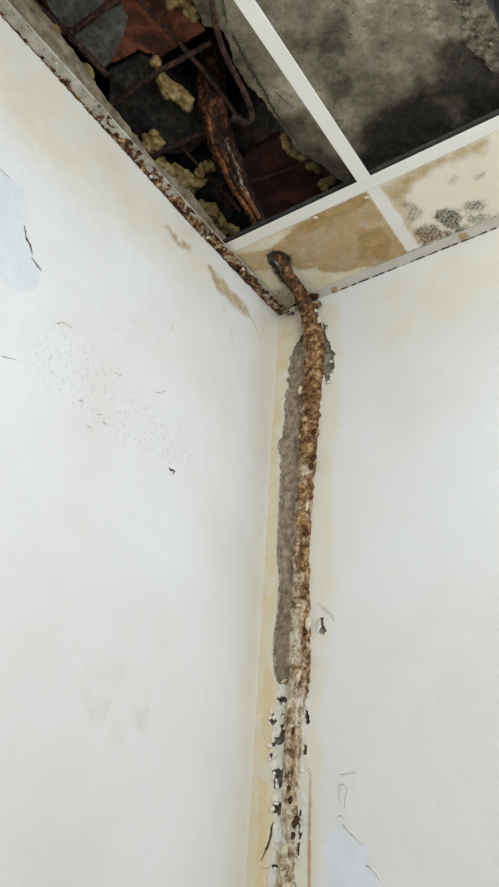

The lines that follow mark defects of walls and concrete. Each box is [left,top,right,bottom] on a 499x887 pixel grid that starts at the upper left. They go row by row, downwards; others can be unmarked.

rust [0,11,286,314]
damp [359,41,499,171]
peeling [0,167,45,297]
damp [242,193,464,305]
spalling [314,309,336,384]
damp [0,15,303,887]
spalling [267,341,316,887]
spalling [302,603,335,636]
damp [293,227,499,887]
peeling [325,821,386,887]